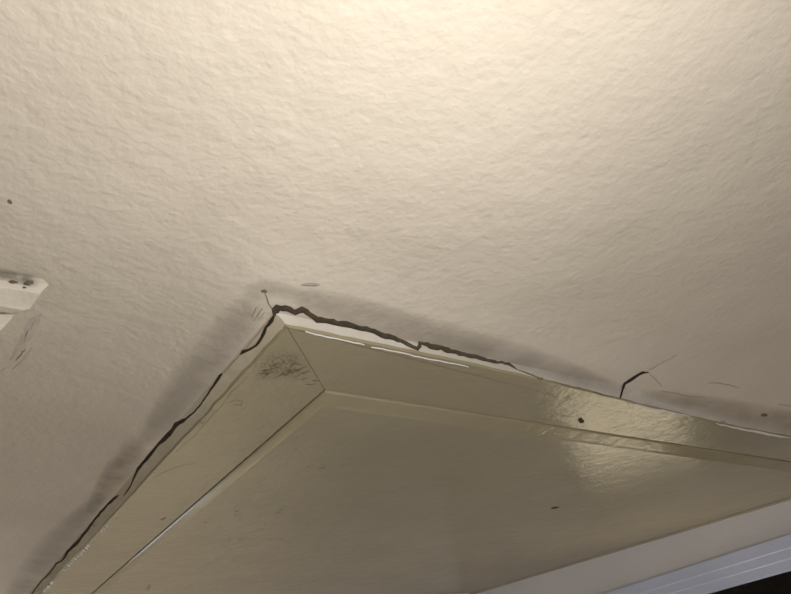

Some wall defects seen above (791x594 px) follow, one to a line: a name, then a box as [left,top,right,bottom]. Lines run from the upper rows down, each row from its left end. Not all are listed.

crack [32,289,738,594]